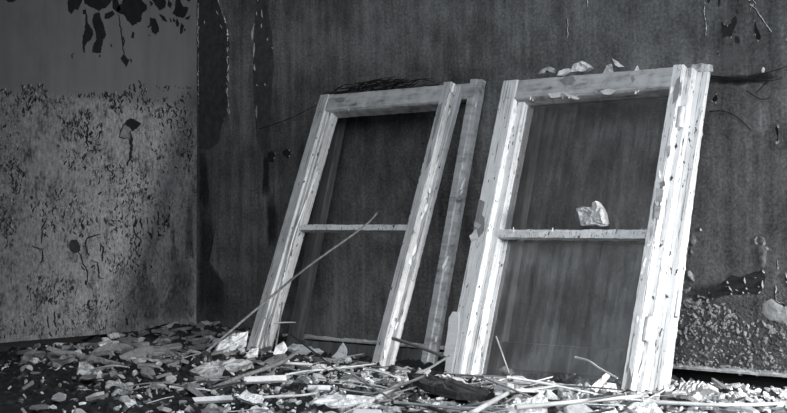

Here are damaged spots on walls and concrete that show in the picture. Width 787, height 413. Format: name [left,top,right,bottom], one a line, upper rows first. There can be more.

peeling [721,0,740,43]
peeling [0,0,230,276]
flaking render [303,334,377,344]
flaking render [670,270,787,378]